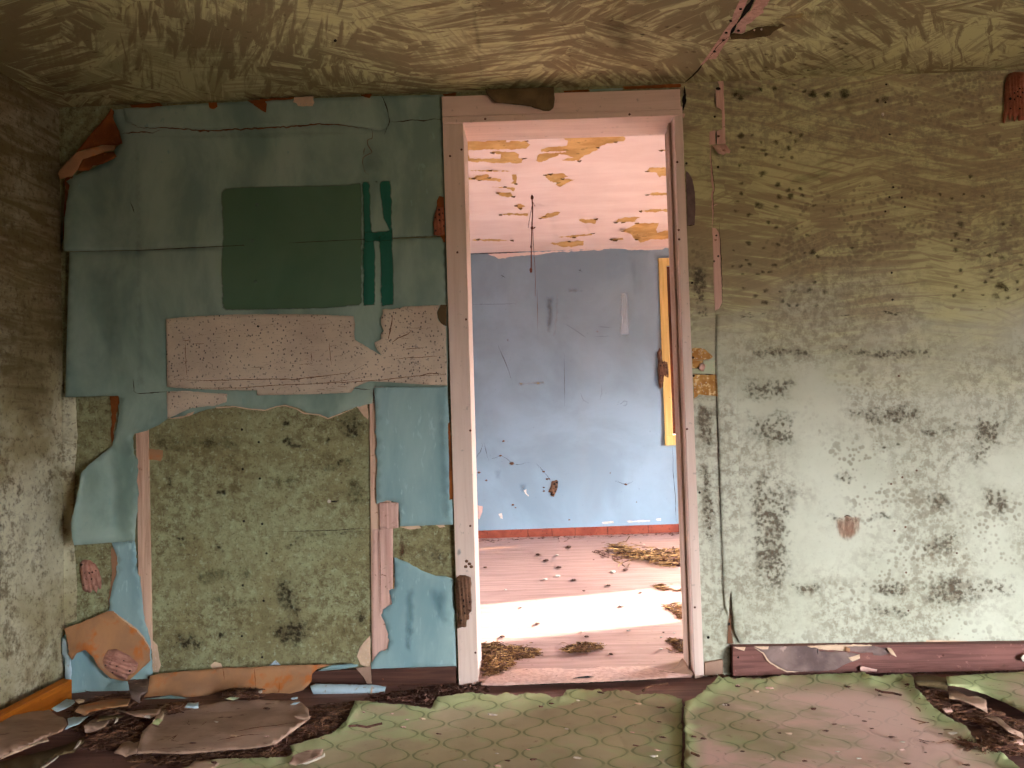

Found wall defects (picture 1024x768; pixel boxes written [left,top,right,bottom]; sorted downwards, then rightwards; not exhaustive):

peeling [468,136,626,219]
peeling [645,167,666,177]
peeling [551,218,598,247]
peeling [609,209,668,243]
peeling [692,348,718,398]
mould [698,405,712,445]
mould [975,419,999,460]
mould [702,466,714,537]
mould [986,490,1008,513]
mould [751,477,788,588]
mould [929,579,1004,605]
mould [275,582,309,645]